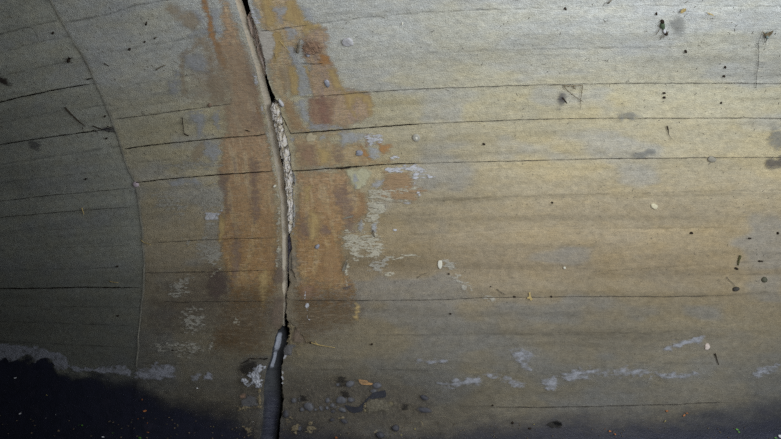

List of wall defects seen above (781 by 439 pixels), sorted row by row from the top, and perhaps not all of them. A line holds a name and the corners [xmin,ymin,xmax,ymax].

crack [242,0,250,16]
crack [668,33,781,85]
crack [309,83,649,97]
rust [197,0,278,303]
rust [254,0,426,318]
damp [341,133,383,158]
crack [478,155,781,163]
damp [341,156,436,285]
crack [0,73,540,439]
crack [557,292,733,300]
damp [155,307,205,359]
damp [0,344,256,439]